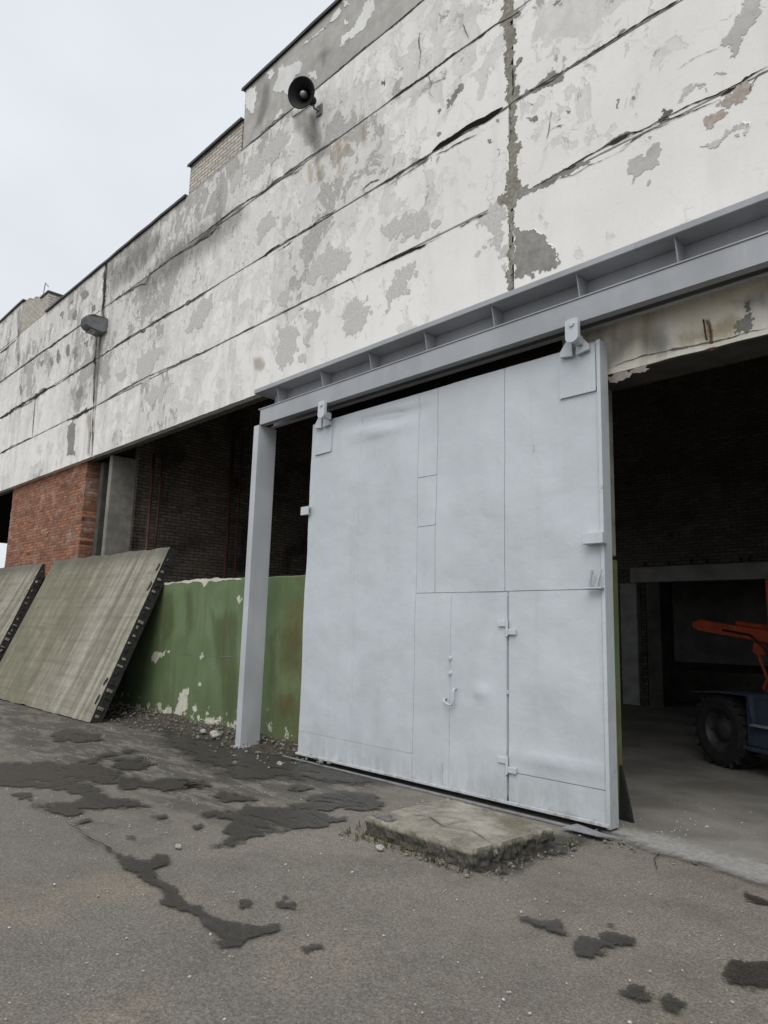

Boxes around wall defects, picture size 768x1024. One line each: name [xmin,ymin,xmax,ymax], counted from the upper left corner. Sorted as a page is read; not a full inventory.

crack [315,1,523,107]
peeling [720,0,762,58]
crack [247,109,293,146]
crack [363,0,678,189]
peeling [475,0,591,291]
peeling [627,136,662,186]
crack [533,67,767,187]
spalling [702,79,754,149]
crack [0,139,488,453]
peeling [341,261,418,338]
spalling [608,365,650,383]
peeling [162,682,221,724]